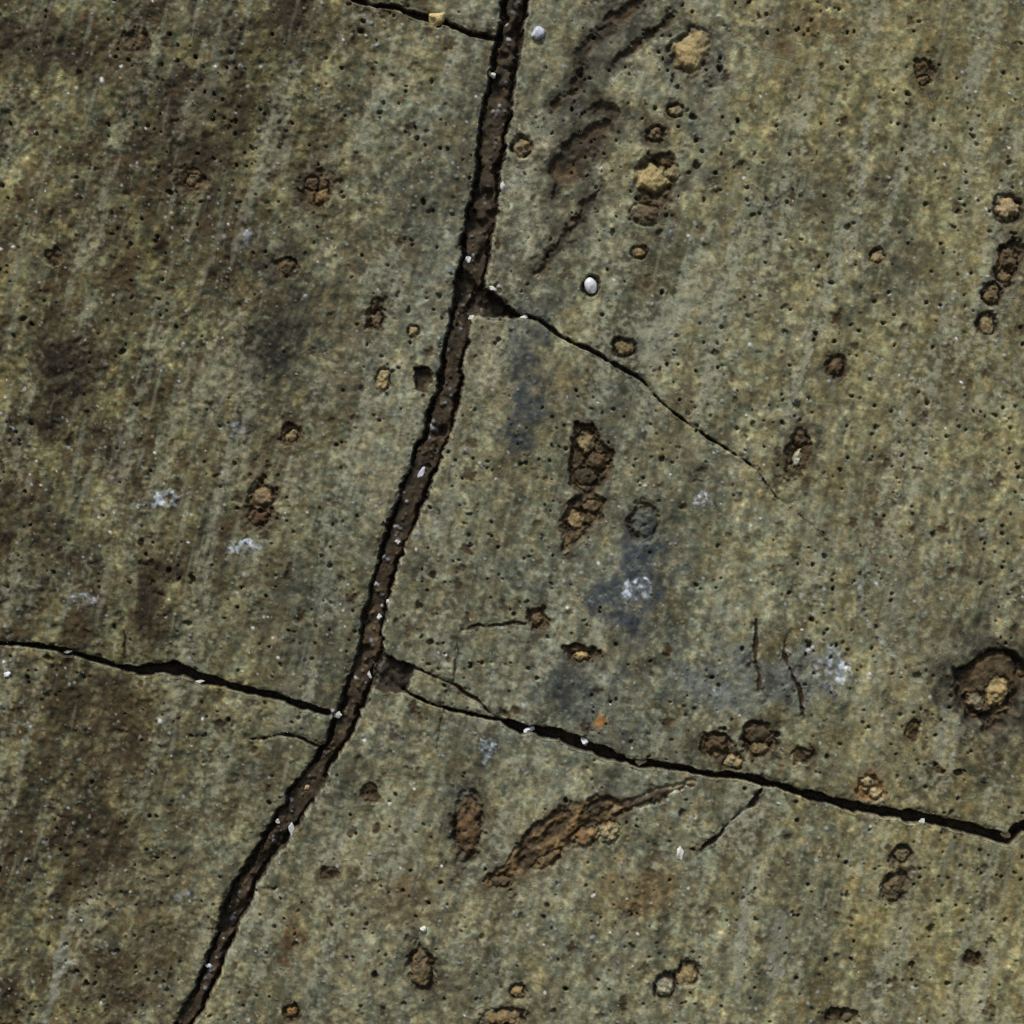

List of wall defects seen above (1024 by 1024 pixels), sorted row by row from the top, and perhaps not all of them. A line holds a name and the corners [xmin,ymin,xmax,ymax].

spalling [464,0,727,424]
spalling [968,179,1024,344]
crack [0,0,534,1024]
spalling [548,413,677,561]
crack [477,287,829,543]
spalling [436,708,827,903]
crack [435,636,1024,851]
crack [751,618,807,723]
spalling [900,606,1024,756]